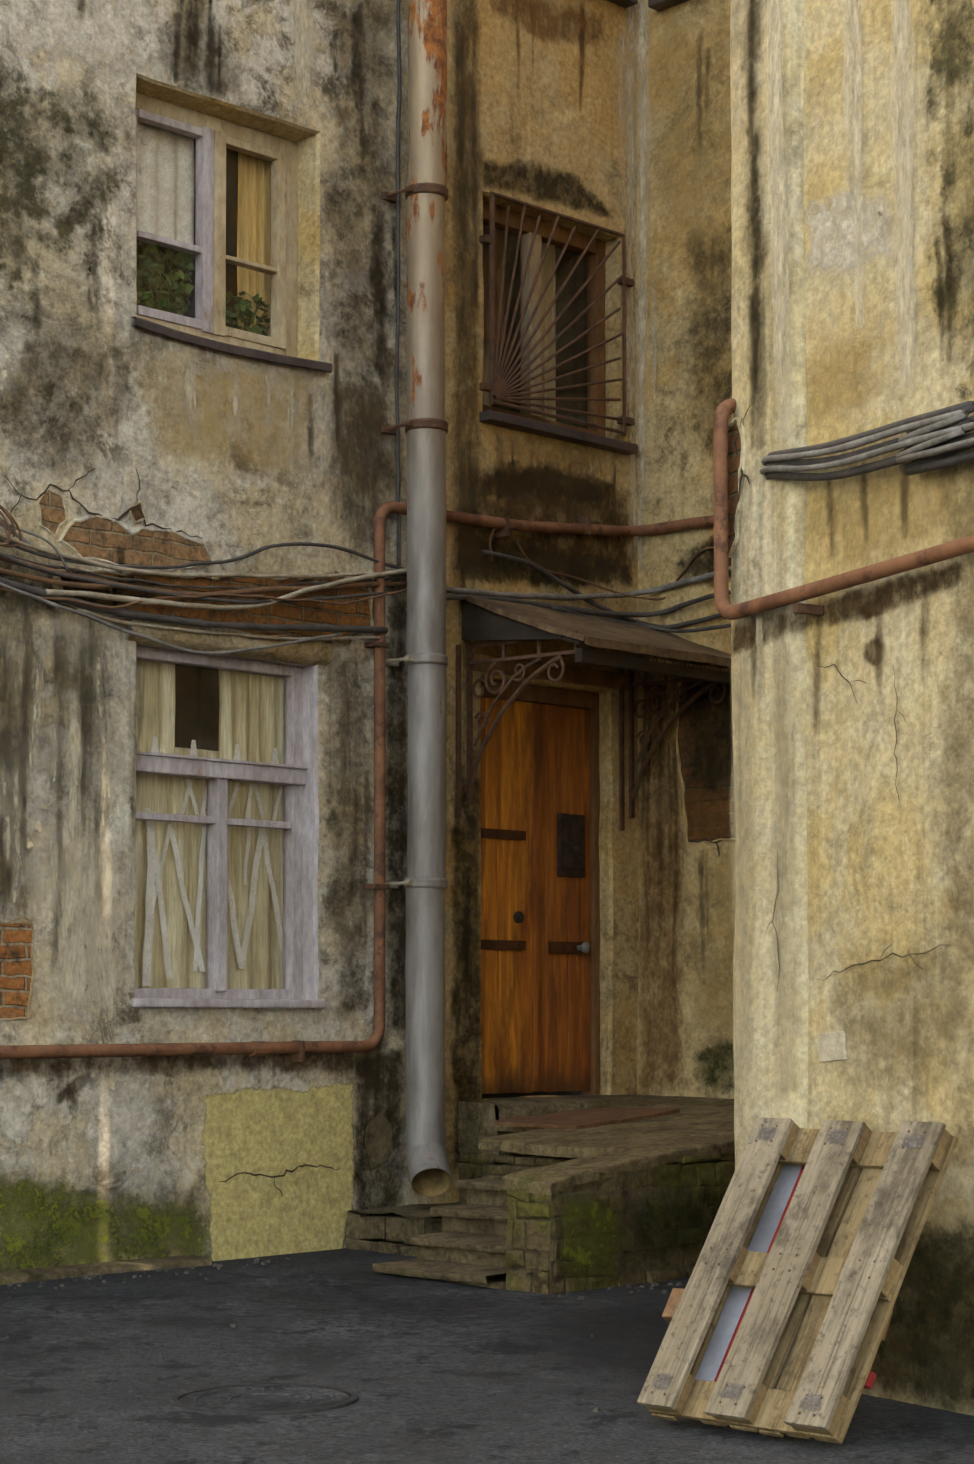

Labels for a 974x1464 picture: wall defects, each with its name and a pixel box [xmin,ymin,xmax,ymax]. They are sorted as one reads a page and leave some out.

leakage [0,65,128,309]
leakage [892,0,974,387]
leakage [454,0,656,611]
spalling [36,488,373,646]
leakage [731,565,960,669]
spalling [0,917,35,1021]
leakage [0,636,125,1022]
leakage [639,680,736,1088]
spalling [676,666,736,846]
crack [765,851,780,991]
crack [818,944,950,981]
crack [219,1164,338,1197]